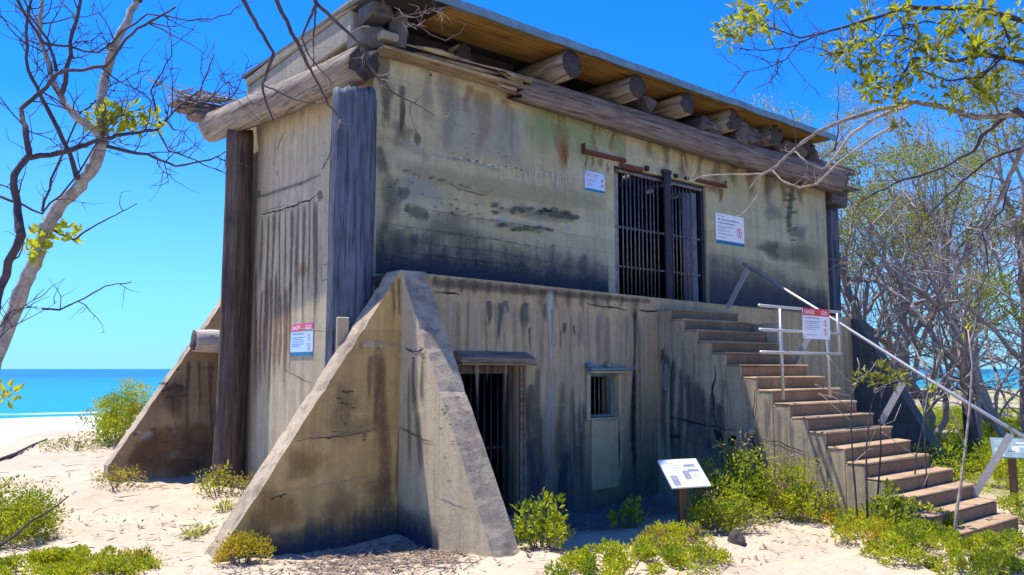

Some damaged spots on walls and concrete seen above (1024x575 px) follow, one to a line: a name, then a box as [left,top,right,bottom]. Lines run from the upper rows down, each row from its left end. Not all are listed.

water stain [382,85,405,134]
rust [556,114,568,163]
crack [261,191,320,215]
peeling [377,148,579,233]
water stain [376,236,649,480]
crack [670,345,803,452]
crack [298,425,432,443]